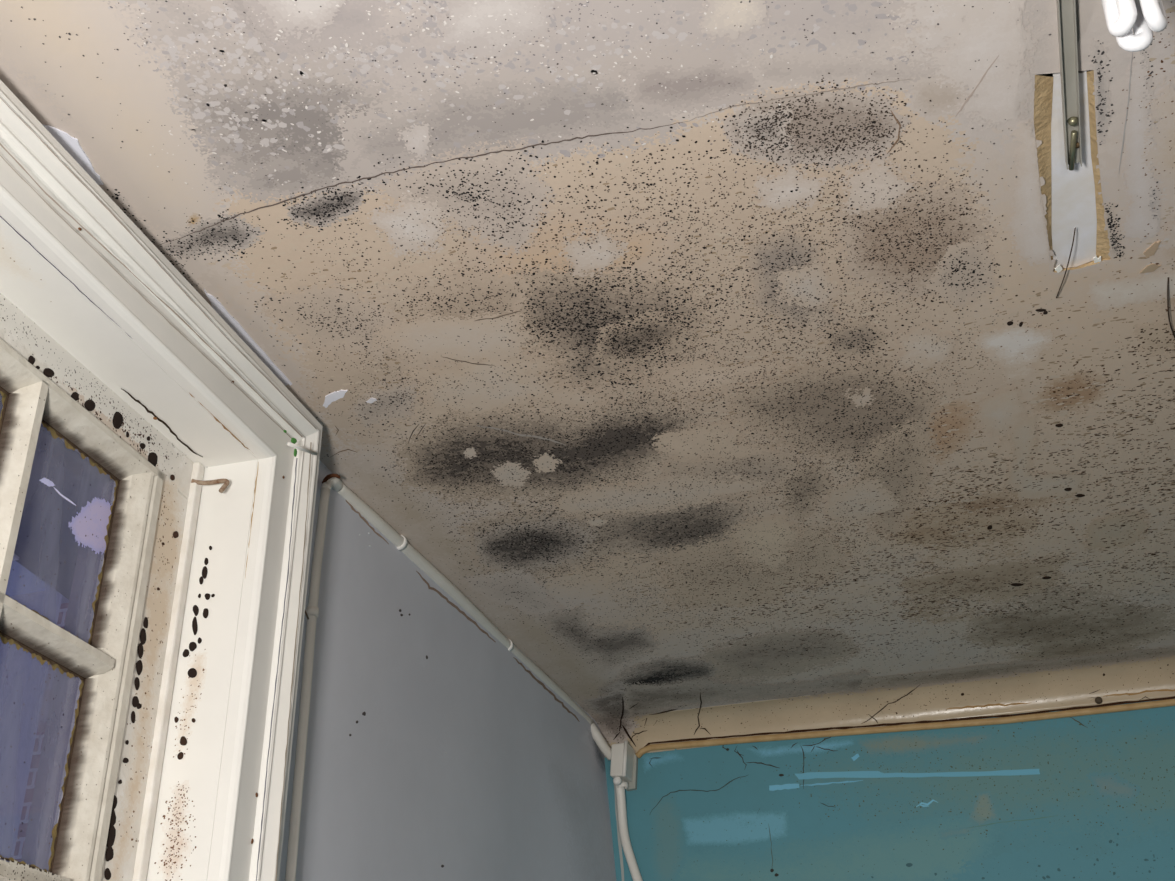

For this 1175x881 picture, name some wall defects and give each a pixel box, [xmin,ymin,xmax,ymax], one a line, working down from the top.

crack [158,79,909,246]
damp [1130,31,1158,149]
corrosion [190,394,258,542]
damp [0,293,187,881]
damp [154,780,196,881]
damp [173,546,215,760]
crack [613,697,636,746]
crack [650,747,836,813]